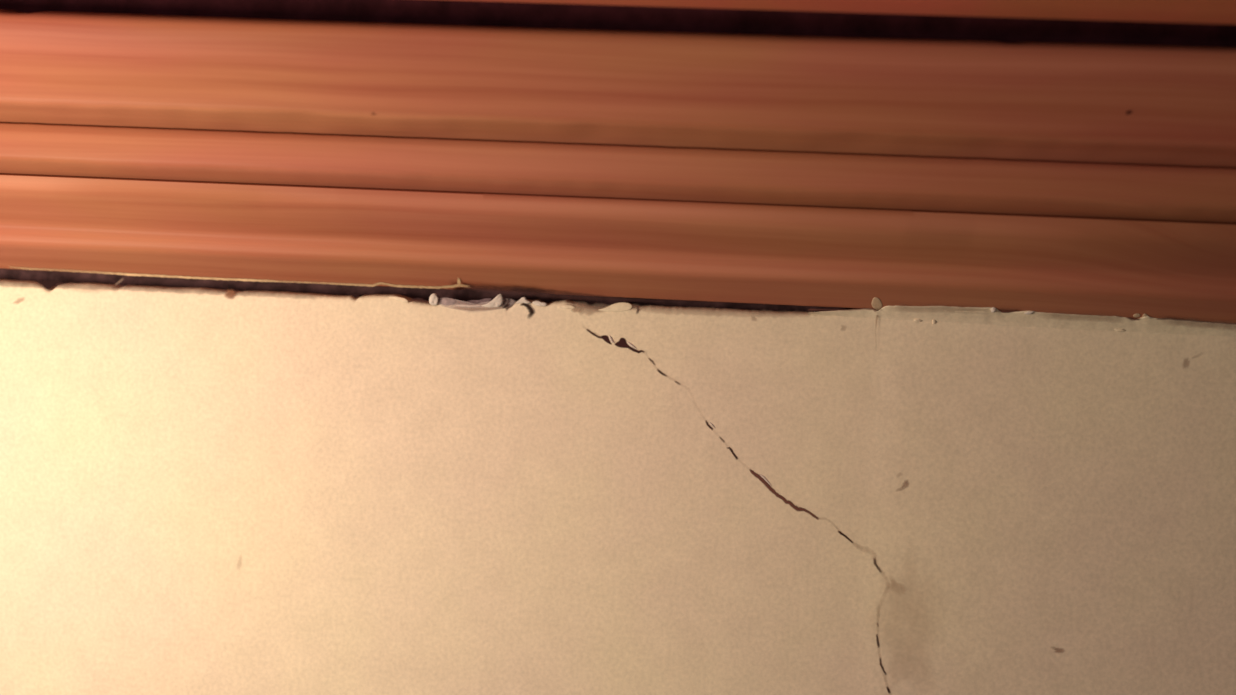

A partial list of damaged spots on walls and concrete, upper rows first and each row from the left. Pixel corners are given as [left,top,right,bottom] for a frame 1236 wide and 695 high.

flaking render [389,293,576,317]
flaking render [599,302,633,312]
crack [587,330,665,376]
crack [706,421,852,542]
crack [876,636,890,693]